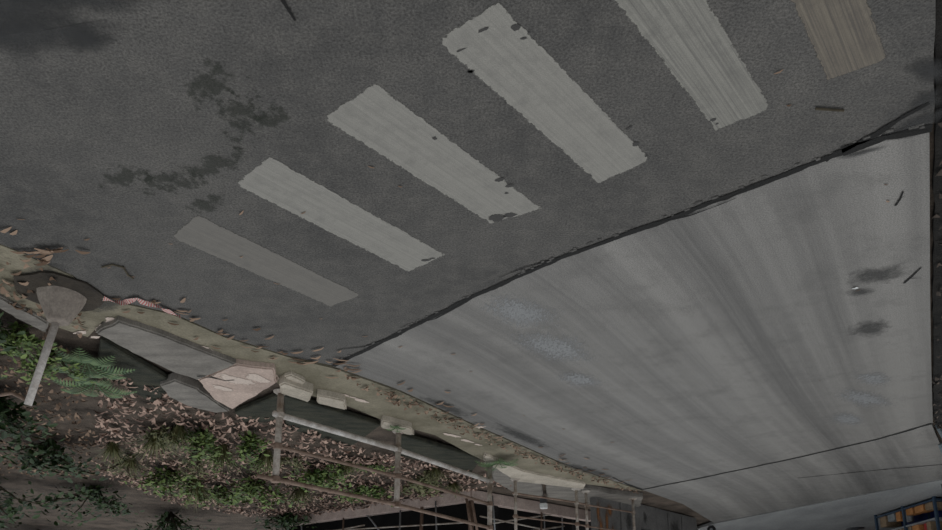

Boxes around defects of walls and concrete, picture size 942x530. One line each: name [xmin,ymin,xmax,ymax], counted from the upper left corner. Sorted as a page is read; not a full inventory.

water stain [855,269,894,294]